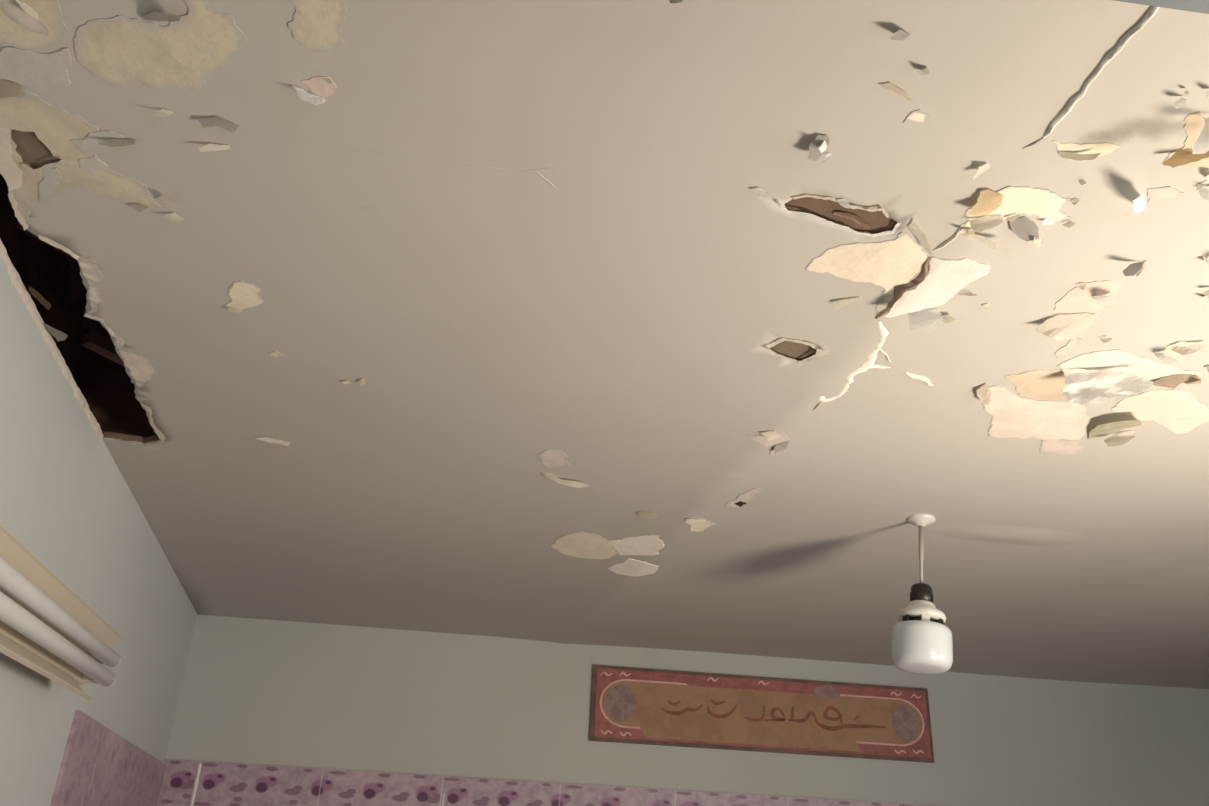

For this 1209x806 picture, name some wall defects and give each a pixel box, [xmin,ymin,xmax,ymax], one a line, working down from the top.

crack [1022,6,1159,149]
peeling [1133,90,1209,214]
peeling [0,0,245,448]
peeling [225,280,264,313]
crack [812,224,963,411]
peeling [806,218,991,331]
peeling [976,261,1209,455]
peeling [549,531,664,577]